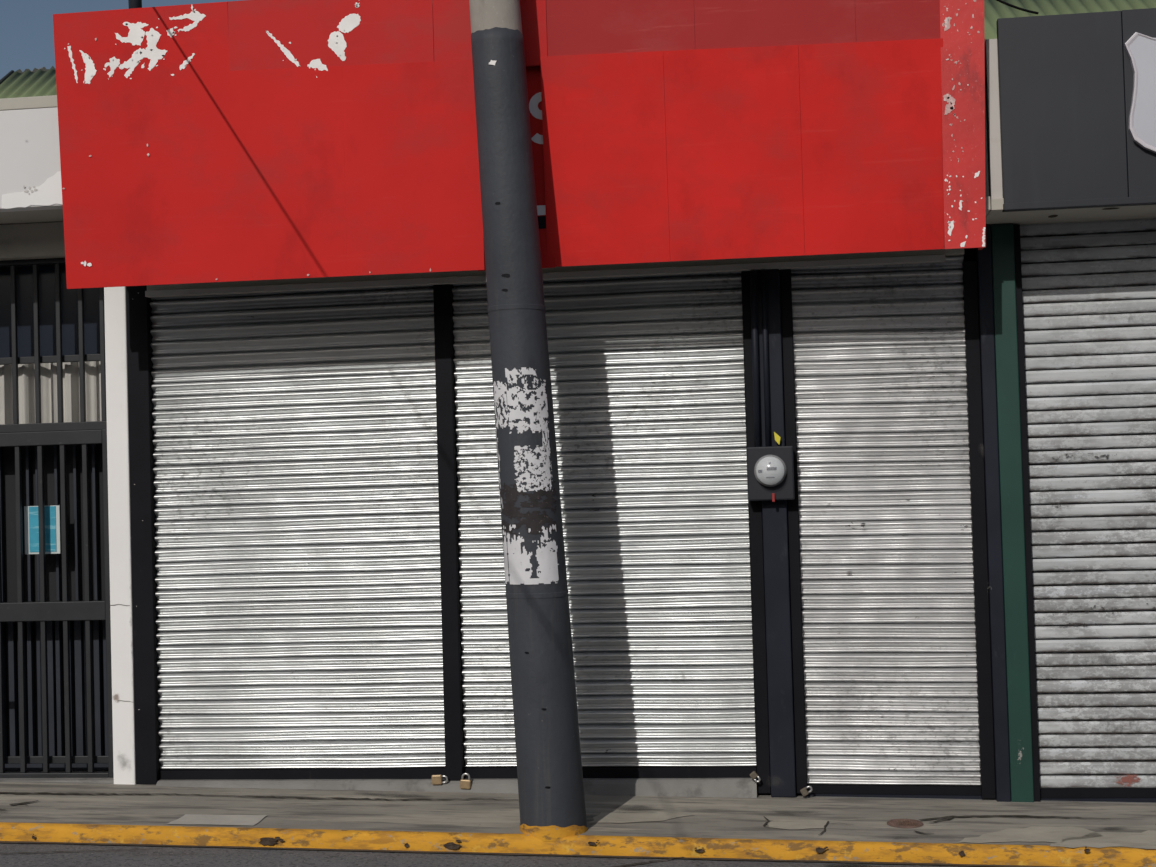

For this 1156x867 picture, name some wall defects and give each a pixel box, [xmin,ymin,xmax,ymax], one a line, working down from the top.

peeling [64,5,206,84]
peeling [266,31,328,77]
peeling [328,2,361,61]
peeling [942,0,980,43]
peeling [943,78,985,247]